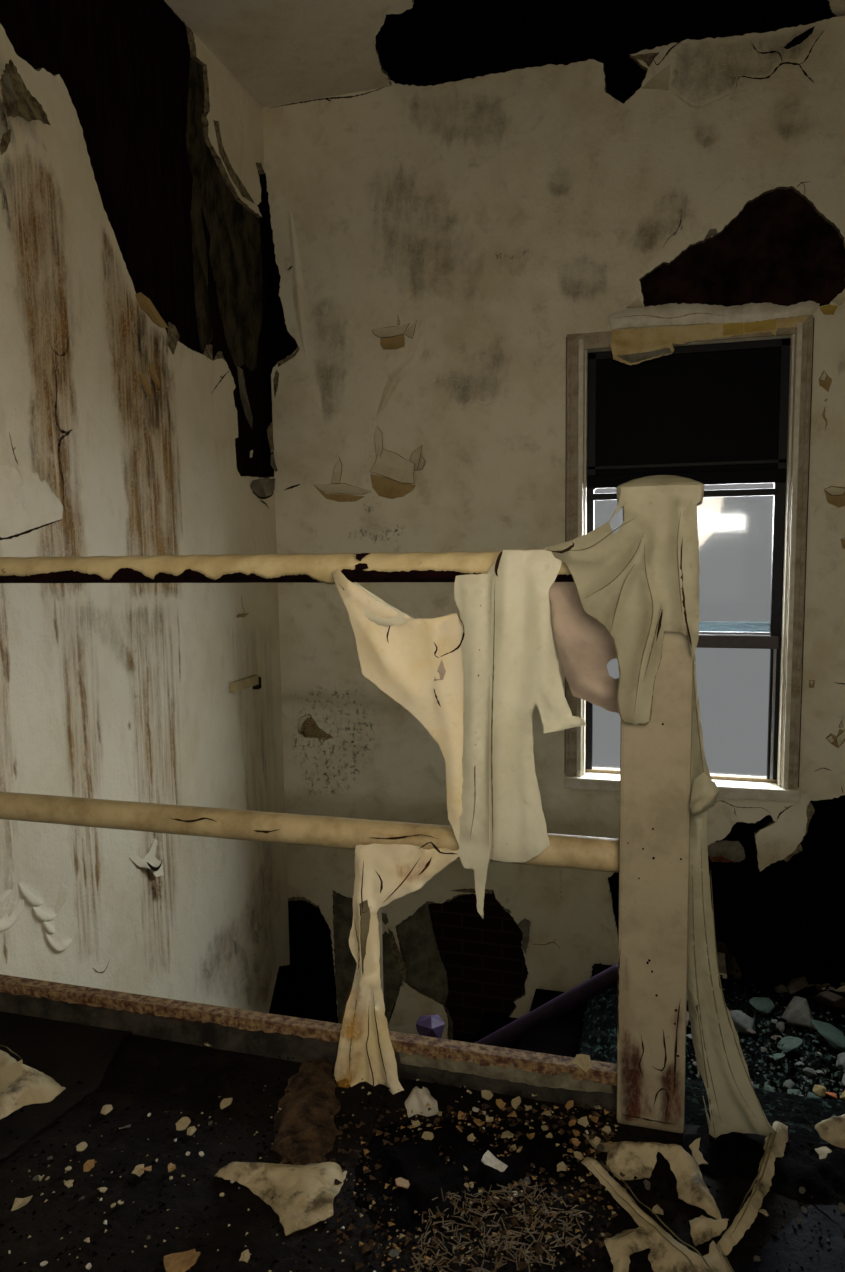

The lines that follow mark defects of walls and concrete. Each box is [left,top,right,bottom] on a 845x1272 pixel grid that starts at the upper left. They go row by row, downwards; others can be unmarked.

flaking render [388,0,838,109]
damp [0,155,80,557]
damp [108,285,181,556]
flaking render [0,0,300,478]
peeling [313,426,426,502]
flaking render [611,189,845,365]
peeling [269,486,845,1272]
rust [0,974,342,1042]
rust [389,1031,641,1120]